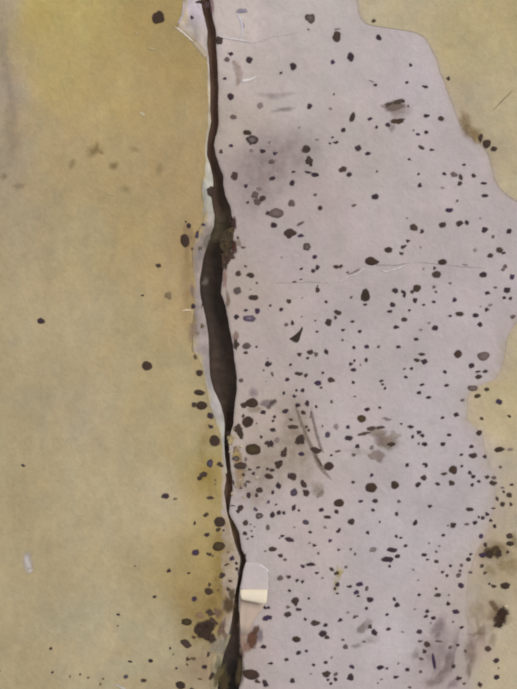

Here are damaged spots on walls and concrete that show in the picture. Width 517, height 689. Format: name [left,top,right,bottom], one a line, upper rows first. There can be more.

damp [266,200,320,273]
mould [234,265,260,322]
damp [392,259,447,329]
crack [196,0,246,689]
peeling [175,0,517,689]
mould [192,390,220,446]
damp [232,388,323,539]
damp [322,408,398,462]
damp [435,465,514,536]
damp [441,533,514,588]
damp [181,542,269,689]
damp [284,589,329,639]